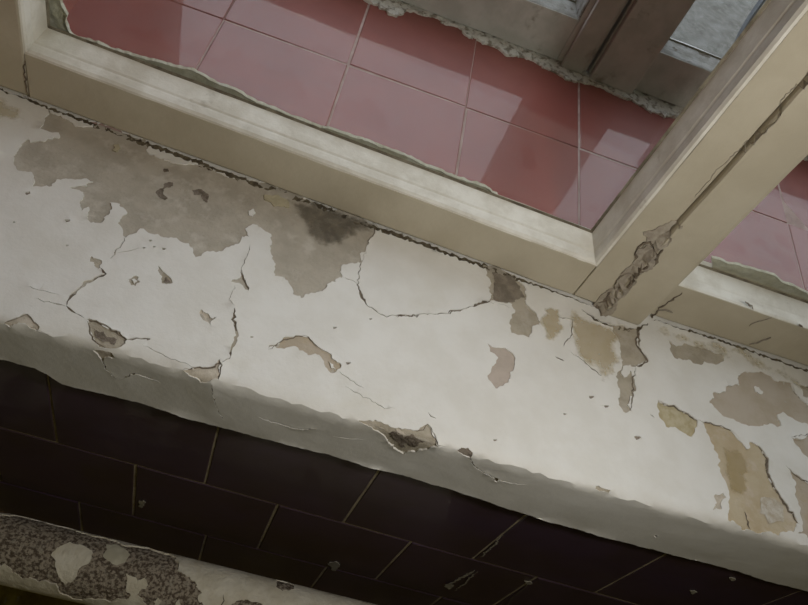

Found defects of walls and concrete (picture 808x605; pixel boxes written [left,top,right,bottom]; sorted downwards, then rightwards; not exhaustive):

peeling [14,111,377,299]
crack [0,61,808,372]
peeling [483,265,539,337]
peeling [272,336,350,372]
peeling [488,345,515,388]
spalling [359,414,438,452]
peeling [651,372,808,537]
peeling [0,515,203,605]
peeling [221,596,262,605]